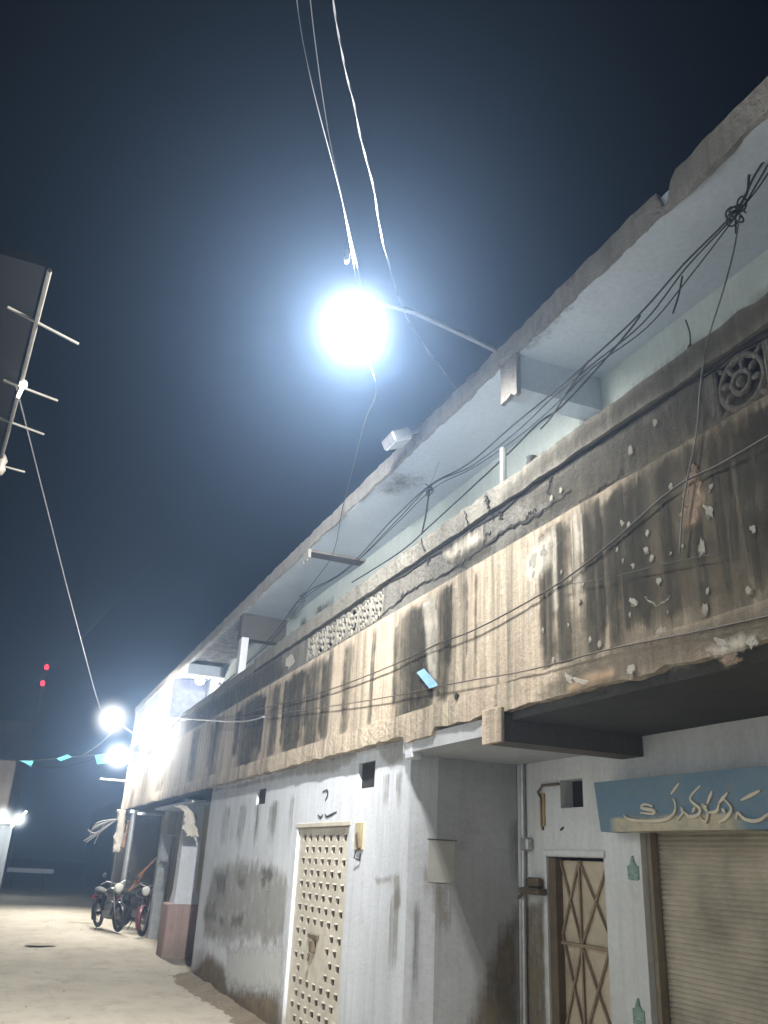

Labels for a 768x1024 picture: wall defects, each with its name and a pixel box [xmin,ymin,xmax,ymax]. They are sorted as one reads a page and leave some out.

damp [536,297,768,467]
crack [377,329,768,620]
spalling [669,462,714,525]
damp [454,528,490,568]
damp [509,384,768,694]
flaking render [698,539,706,558]
flaking render [700,587,710,618]
damp [193,620,254,667]
damp [393,585,452,715]
flaking render [713,635,759,664]
damp [186,655,351,780]